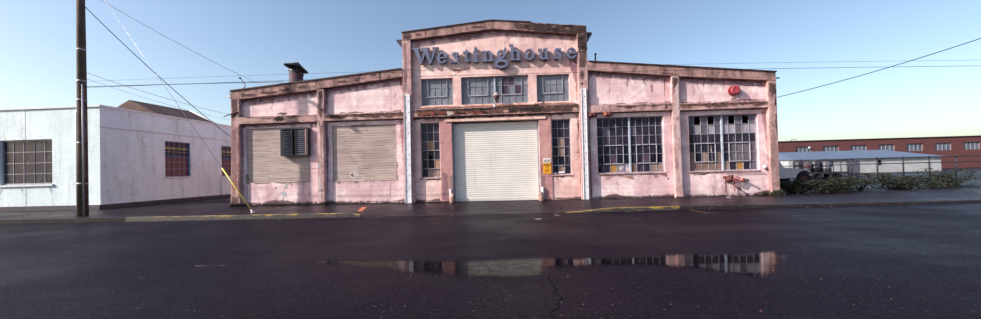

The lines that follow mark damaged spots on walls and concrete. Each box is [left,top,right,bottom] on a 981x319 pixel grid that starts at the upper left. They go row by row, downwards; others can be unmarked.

spalling [246,156,321,201]
leakage [231,23,777,207]